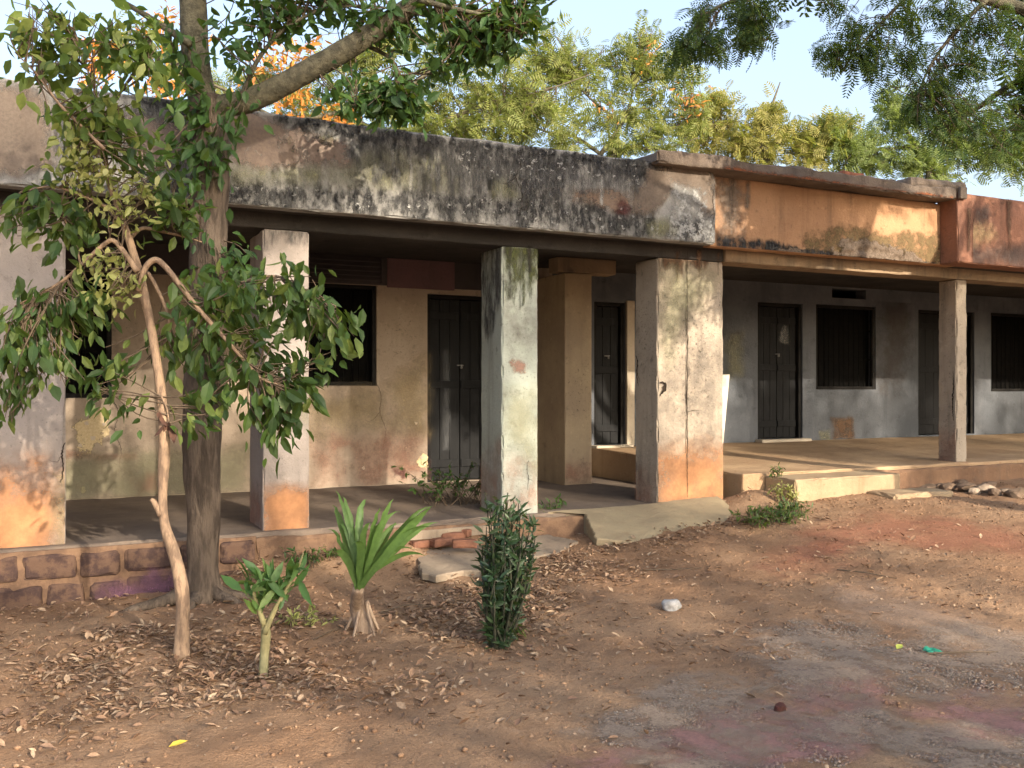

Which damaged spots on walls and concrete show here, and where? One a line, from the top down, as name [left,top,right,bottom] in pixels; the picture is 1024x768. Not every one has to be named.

damp [228,116,935,282]
flaking render [72,408,110,457]